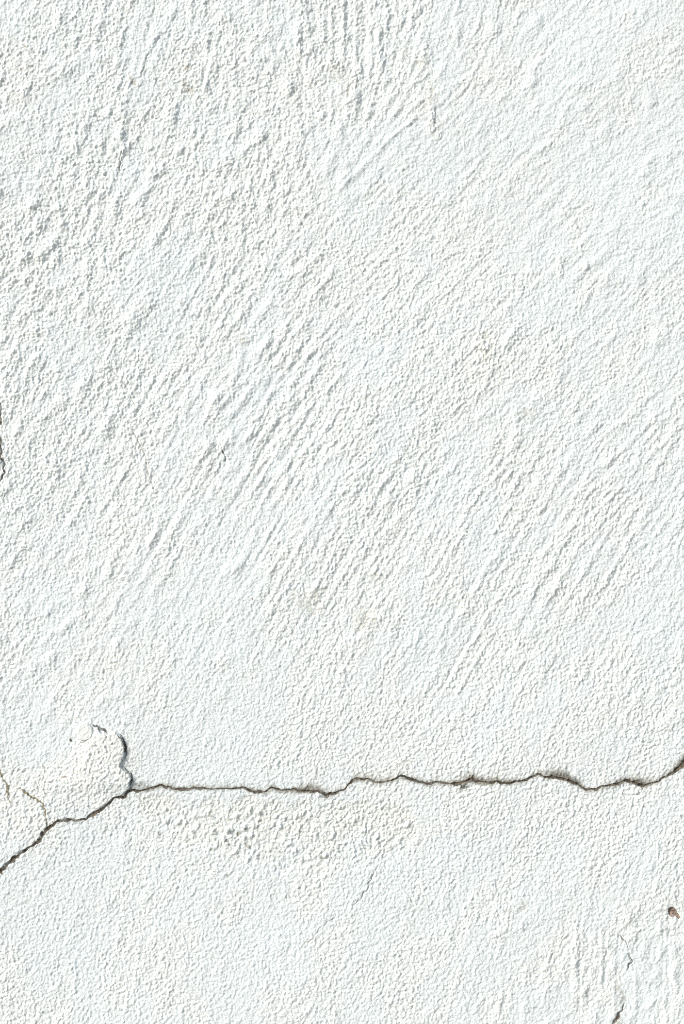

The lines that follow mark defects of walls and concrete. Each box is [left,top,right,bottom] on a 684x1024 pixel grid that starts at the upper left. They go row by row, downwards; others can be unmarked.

crack [672,760,684,774]
crack [0,770,646,874]